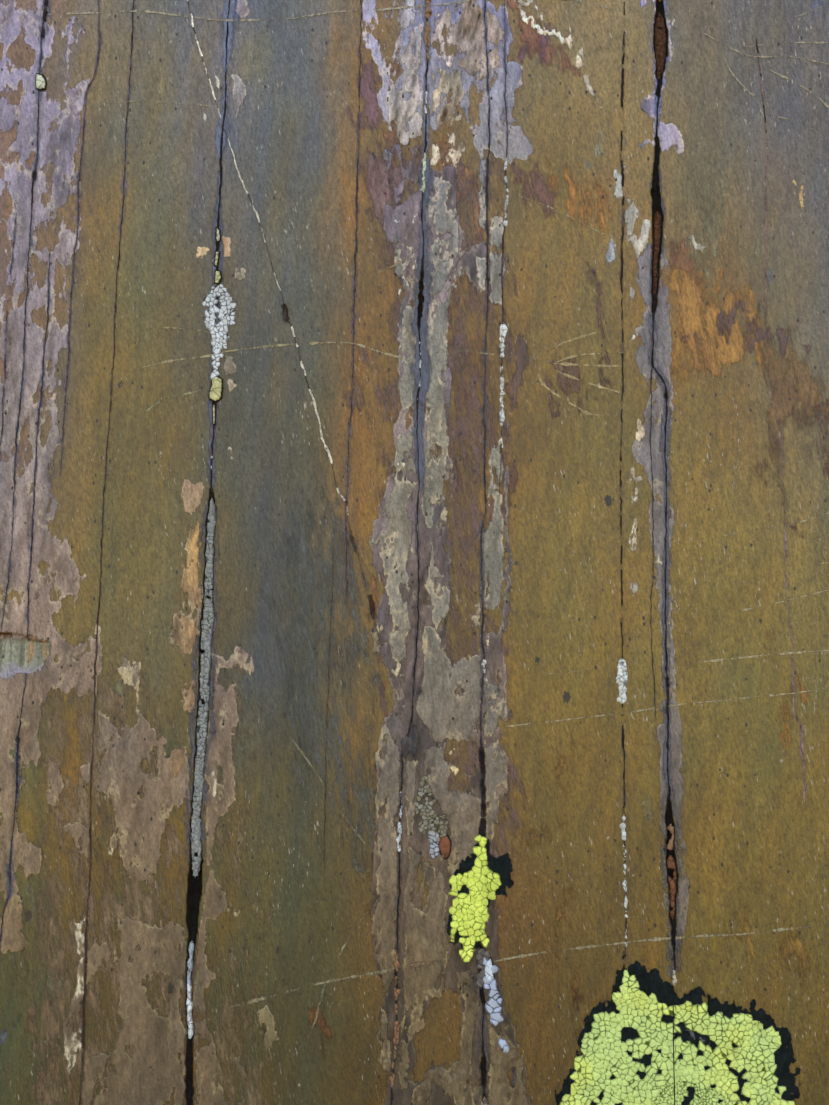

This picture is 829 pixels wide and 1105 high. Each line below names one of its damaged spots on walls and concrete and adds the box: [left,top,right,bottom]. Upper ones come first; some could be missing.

spalling [0,631,50,679]
crack [0,0,102,943]
crack [79,0,134,1105]
crack [185,0,381,1105]
crack [390,3,434,1105]
crack [474,945,489,1105]
crack [478,0,508,837]
crack [620,0,681,1105]